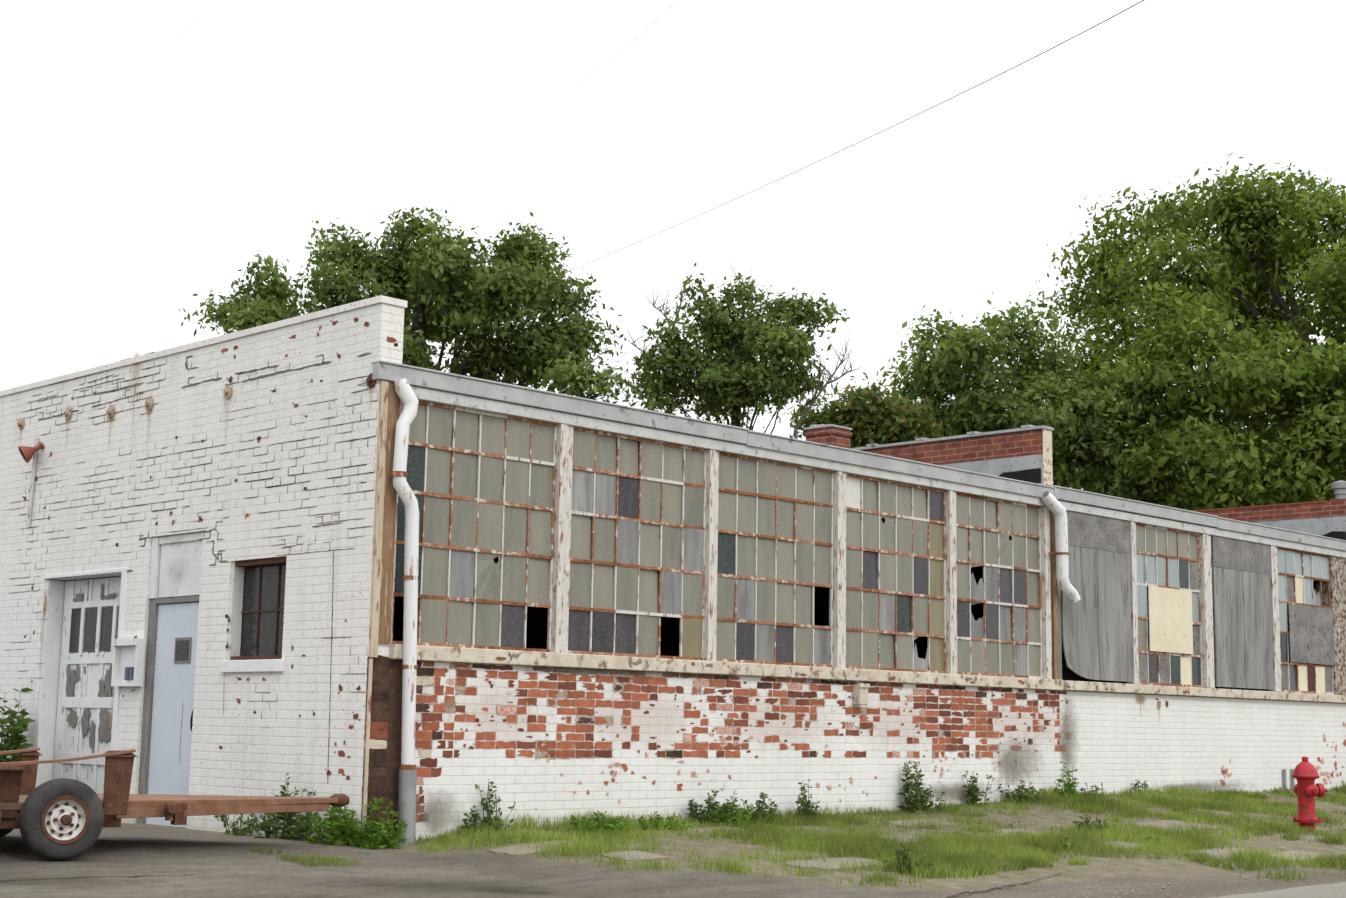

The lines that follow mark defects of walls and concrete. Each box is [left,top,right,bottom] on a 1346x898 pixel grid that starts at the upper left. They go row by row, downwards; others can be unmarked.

peeling [100,583,116,600]
peeling [66,663,134,754]
peeling [325,655,1071,836]